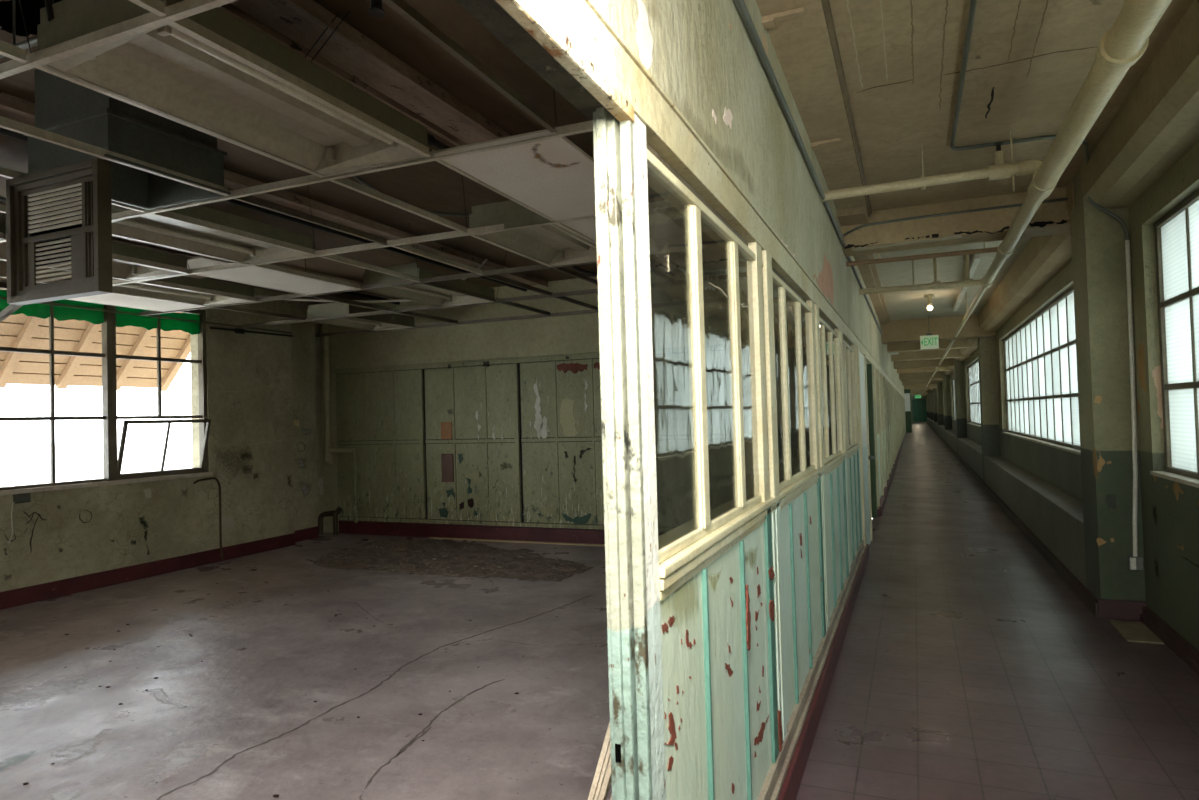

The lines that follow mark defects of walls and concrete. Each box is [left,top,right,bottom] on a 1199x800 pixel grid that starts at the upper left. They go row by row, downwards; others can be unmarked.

peeling [637,0,653,70]
crack [847,0,1094,119]
peeling [712,108,733,129]
peeling [844,226,1009,251]
spalling [1029,219,1071,228]
peeling [530,378,550,438]
peeling [557,356,600,413]
peeling [661,616,696,649]
peeling [729,567,775,650]
crack [156,595,592,800]
peeling [664,676,691,771]
peeling [754,665,783,758]